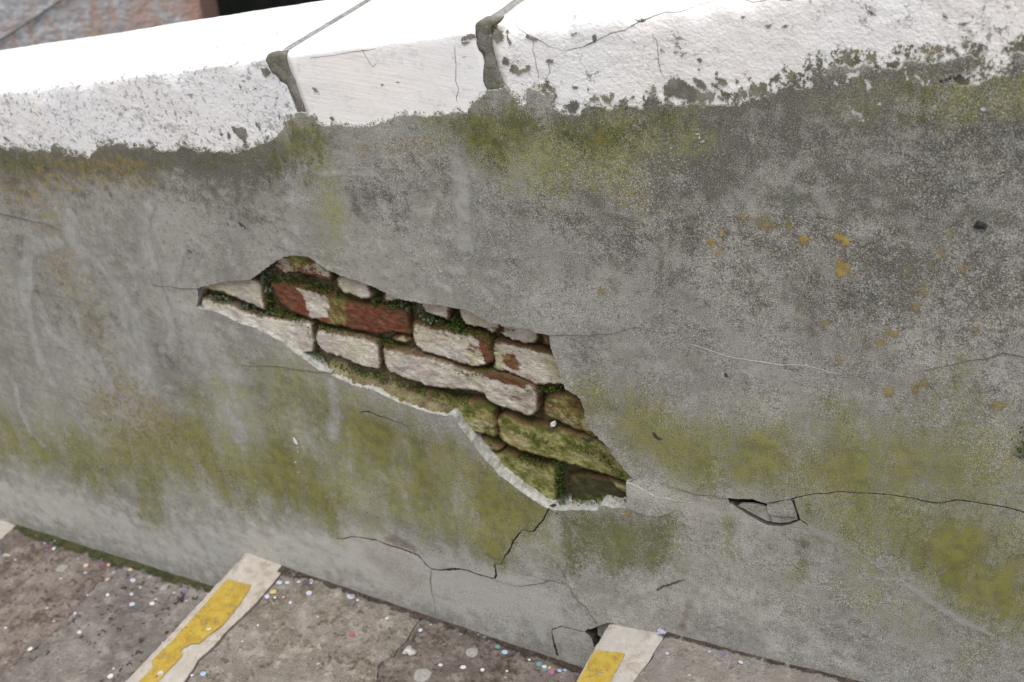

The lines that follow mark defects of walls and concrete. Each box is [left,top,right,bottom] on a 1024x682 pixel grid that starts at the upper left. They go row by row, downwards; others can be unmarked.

crack [515,0,715,87]
peeling [492,14,1024,113]
water stain [326,378,344,442]
flaking render [196,255,674,517]
crack [629,478,729,515]
crack [495,504,598,625]